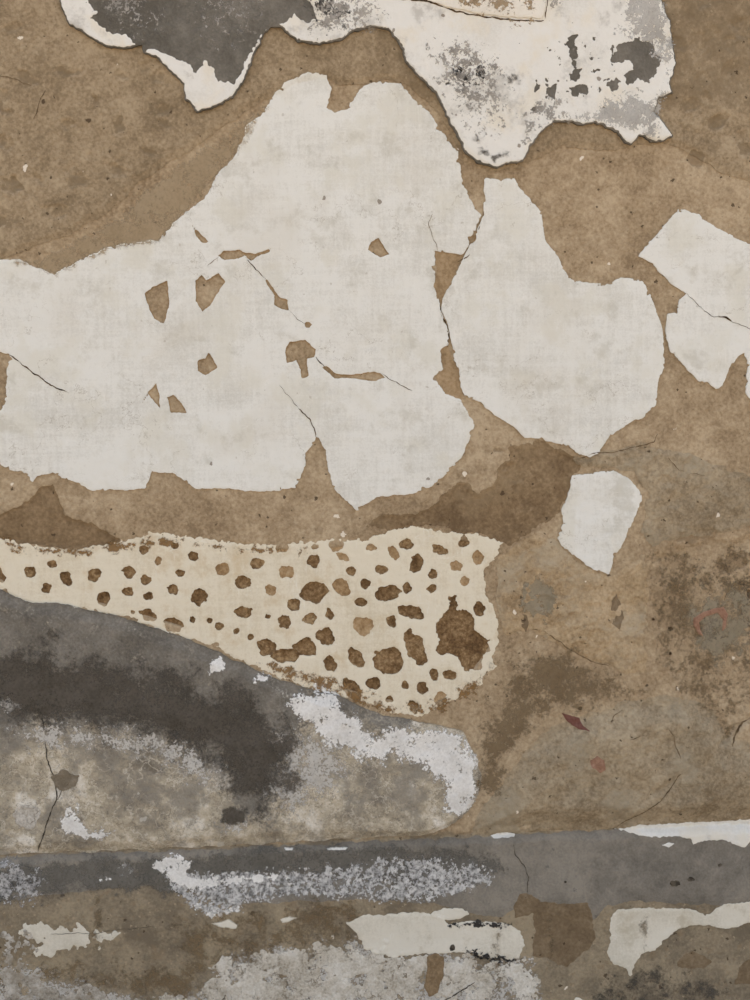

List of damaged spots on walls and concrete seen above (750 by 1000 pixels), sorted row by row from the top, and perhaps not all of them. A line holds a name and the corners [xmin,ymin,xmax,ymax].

peeling [61,0,135,47]
peeling [146,30,266,111]
peeling [280,0,676,166]
flaking render [436,346,463,400]
flaking render [366,439,750,675]
crack [38,717,70,850]
leakage [0,631,634,841]
peeling [0,921,121,1000]
leakage [0,843,512,1000]
peeling [134,893,596,1000]
leakage [426,946,542,1000]
peeling [607,902,750,976]